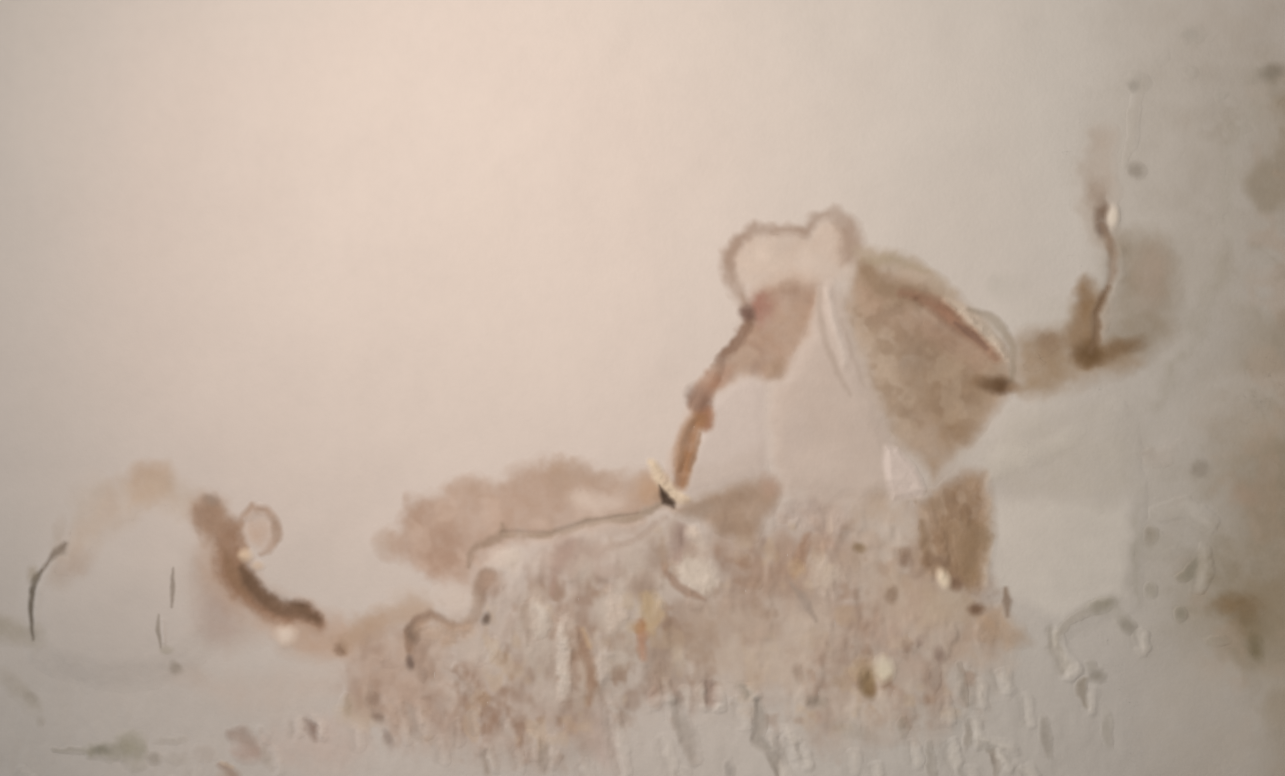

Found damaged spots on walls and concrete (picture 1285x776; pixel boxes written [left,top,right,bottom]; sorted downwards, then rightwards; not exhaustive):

leakage [979,0,1285,776]
crack [26,463,109,641]
leakage [161,450,1024,776]
peeling [646,673,816,776]
spalling [848,652,898,702]